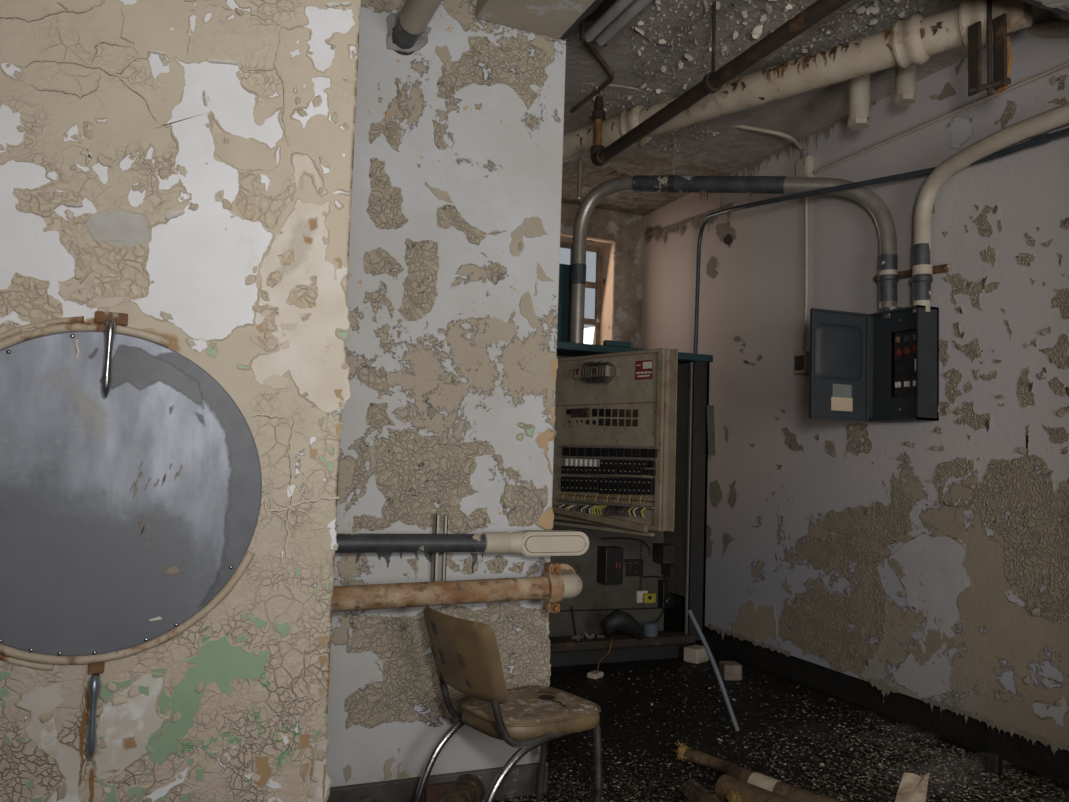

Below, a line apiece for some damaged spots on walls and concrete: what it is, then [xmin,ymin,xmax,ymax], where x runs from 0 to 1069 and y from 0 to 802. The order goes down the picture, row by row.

crack [0,0,159,123]
crack [184,0,303,145]
spalling [373,0,431,55]
peeling [572,0,817,120]
peeling [368,117,403,152]
peeling [0,0,358,482]
peeling [1016,253,1069,319]
peeling [327,518,338,550]
peeling [888,533,971,699]
crack [74,664,95,797]
rust [79,691,94,802]
peeling [0,668,182,802]